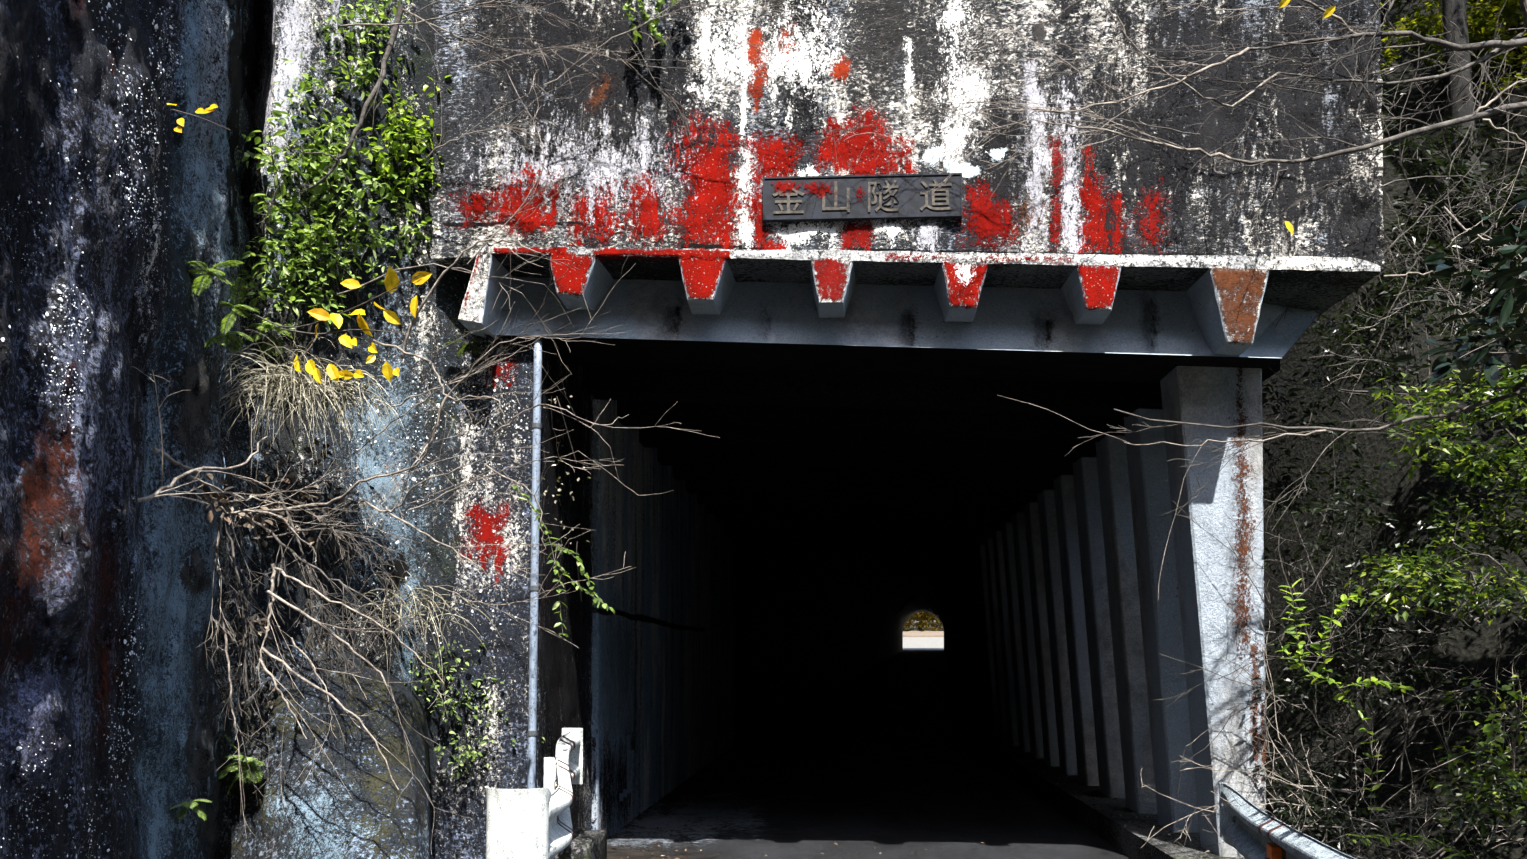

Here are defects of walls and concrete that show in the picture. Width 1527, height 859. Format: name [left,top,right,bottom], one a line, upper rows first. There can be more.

damp [454,0,865,260]
damp [870,0,1228,287]
rust [1211,266,1270,345]
rust [0,360,103,707]
rust [1225,368,1267,807]